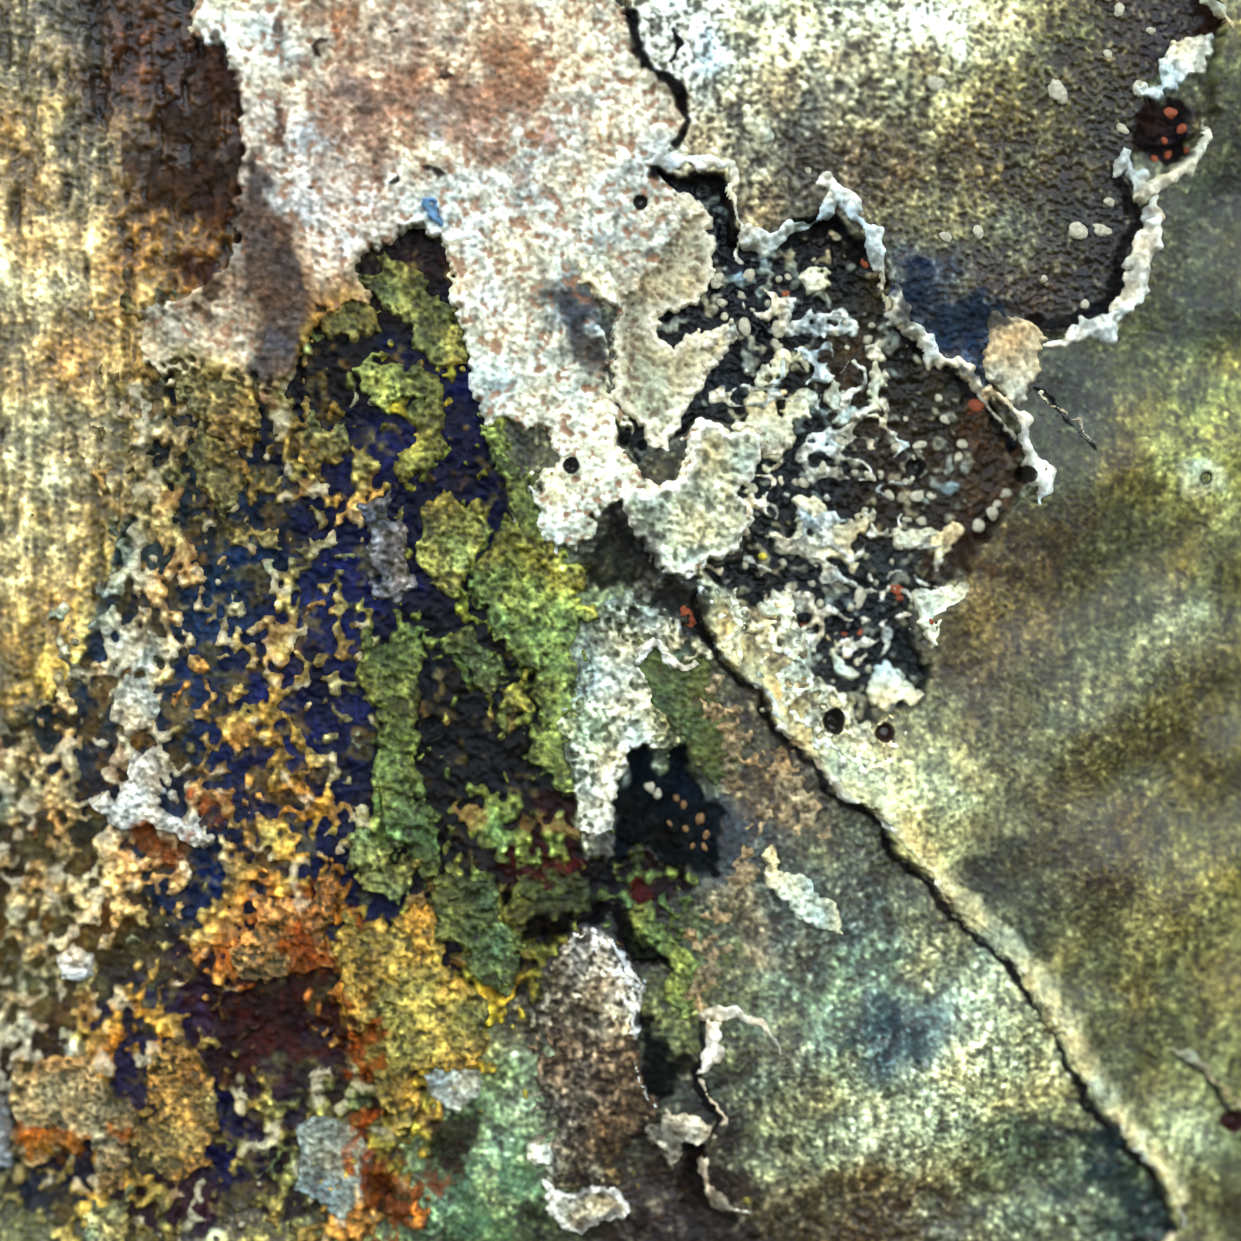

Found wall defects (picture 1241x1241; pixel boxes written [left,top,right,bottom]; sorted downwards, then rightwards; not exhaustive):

spalling [1133,33,1215,166]
peeling [138,0,1047,729]
peeling [110,674,161,737]
peeling [557,591,736,877]
peeling [89,746,215,848]
peeling [56,943,95,981]
crack [690,586,1189,1241]
peeling [0,1093,14,1167]
peeling [294,1115,374,1221]
peeling [423,1068,483,1115]
peeling [526,926,717,1235]
crack [1169,1048,1241,1112]